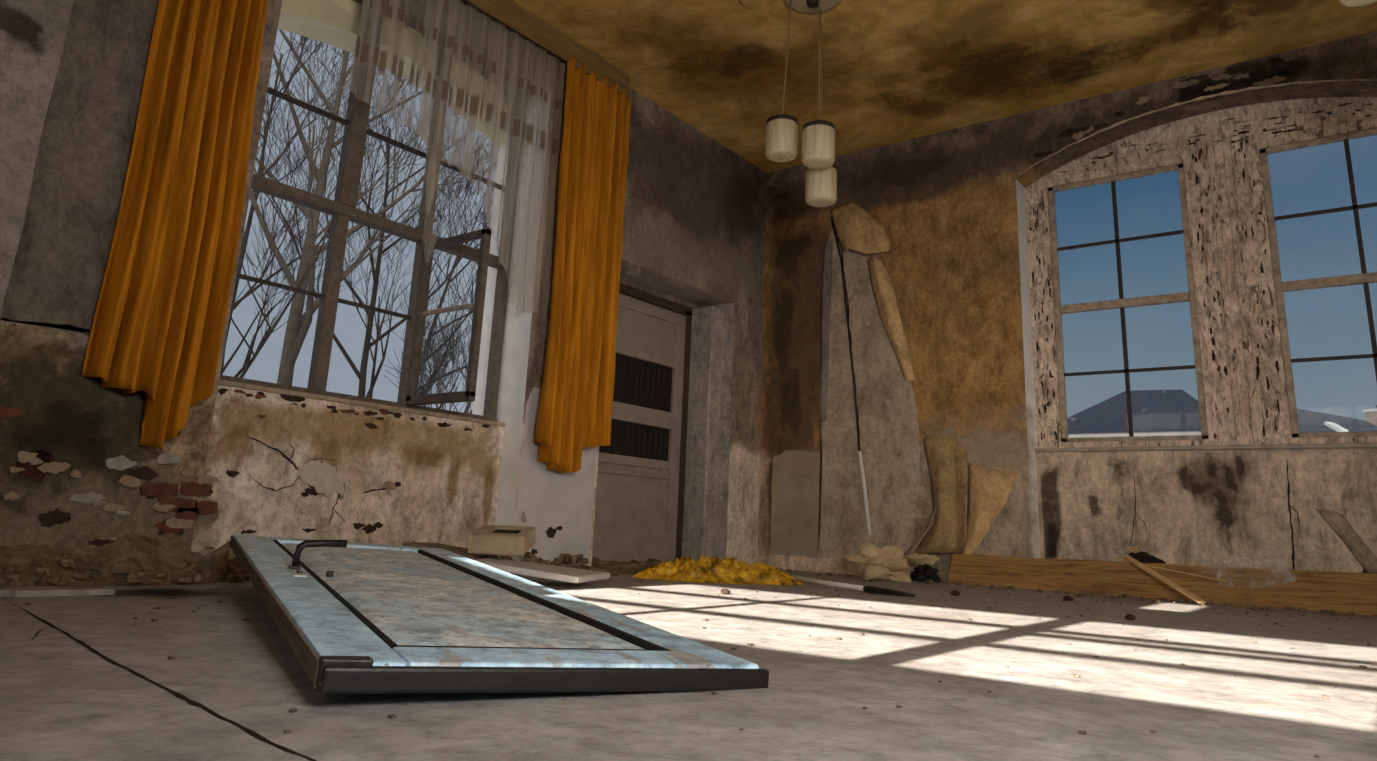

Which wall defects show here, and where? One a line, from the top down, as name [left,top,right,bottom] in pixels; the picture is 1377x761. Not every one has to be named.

leakage [0,6,43,52]
leakage [883,0,1295,114]
leakage [837,124,1024,210]
peeling [1032,254,1058,440]
flaking render [0,449,240,557]
spalling [353,522,384,535]
leakage [1088,496,1101,515]
leakage [1179,456,1244,527]
crack [3,598,316,761]